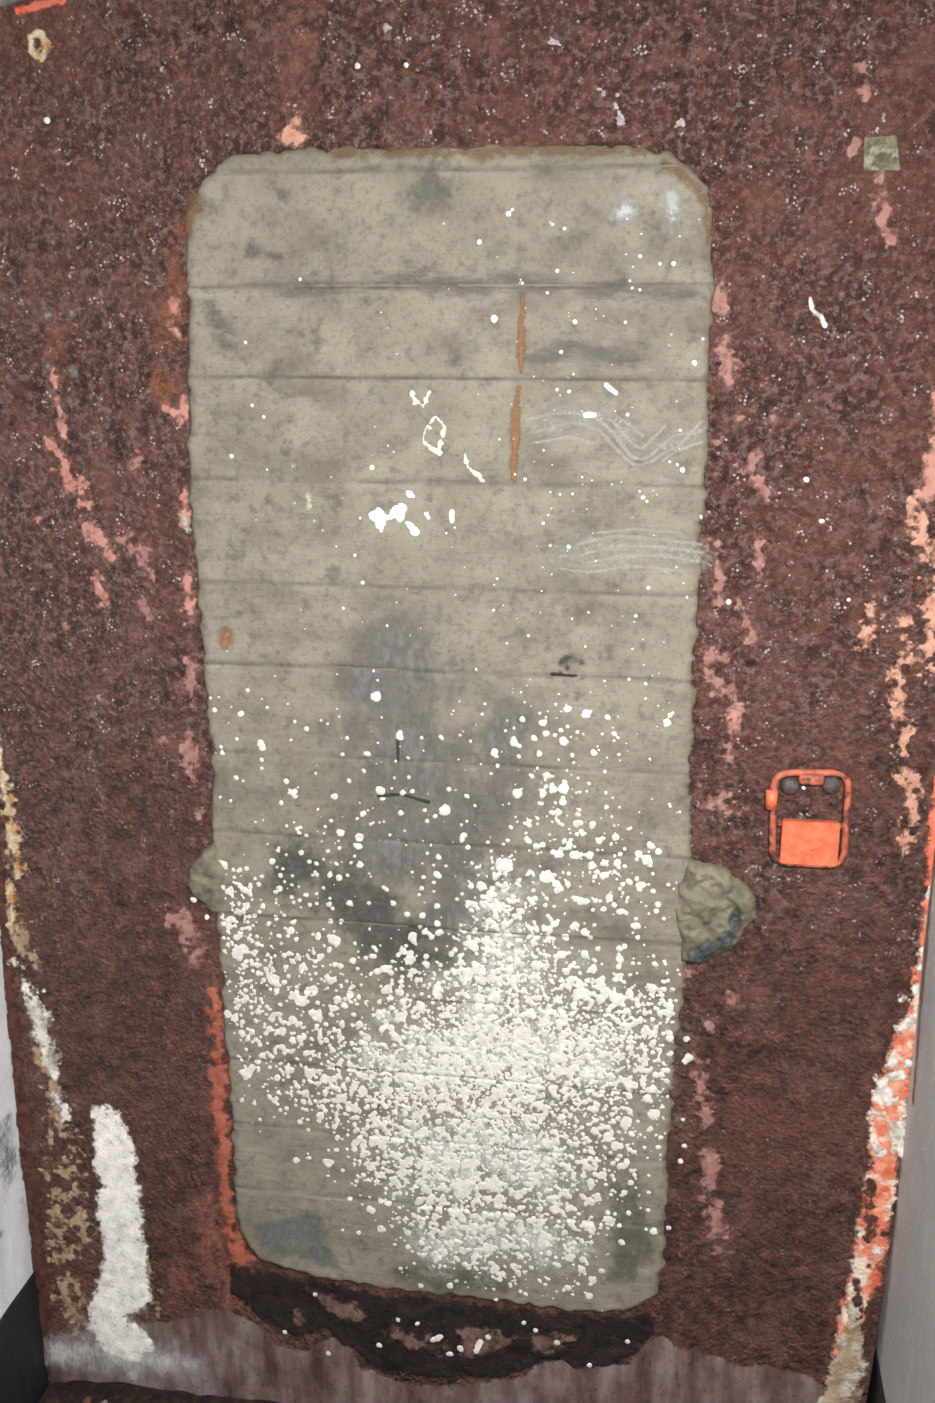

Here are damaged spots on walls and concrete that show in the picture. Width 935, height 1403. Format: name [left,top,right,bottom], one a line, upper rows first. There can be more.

peeling [277,115,307,147]
peeling [871,170,898,249]
peeling [713,334,742,391]
water stain [0,740,27,936]
corrosion [0,857,55,1366]
water stain [7,957,71,1126]
water stain [190,602,742,1311]
peeling [26,367,935,1403]
corrosion [912,851,935,1104]
water stain [50,1103,197,1379]
corrosion [851,1264,877,1346]
corrosion [862,1178,889,1243]